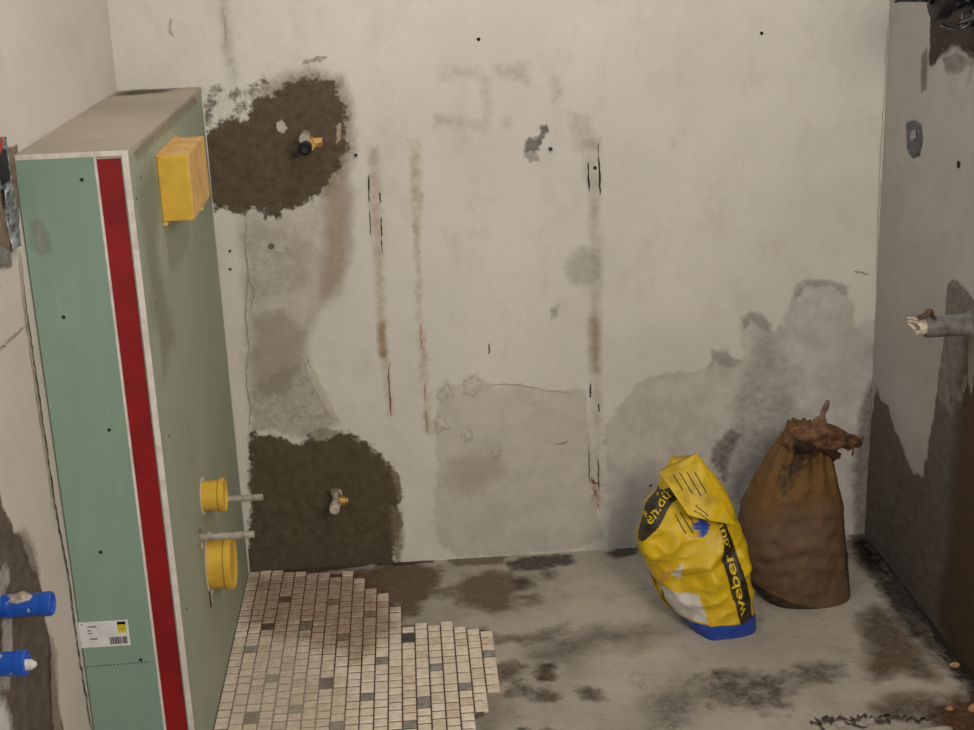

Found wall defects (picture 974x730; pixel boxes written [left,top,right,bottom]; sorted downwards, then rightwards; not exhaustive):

peeling [204,79,269,128]
peeling [0,244,12,268]
crack [0,253,93,730]
peeling [387,461,402,503]